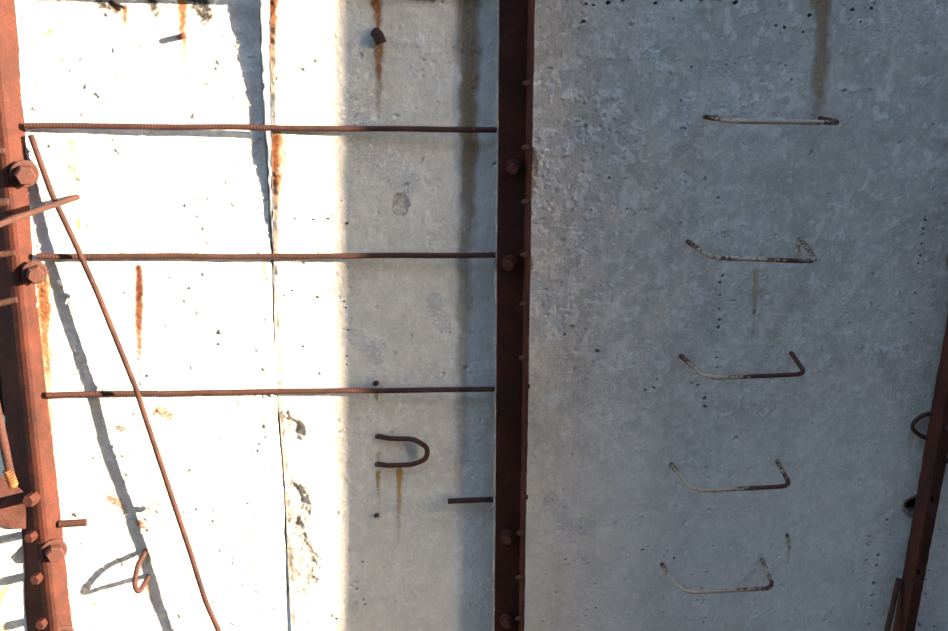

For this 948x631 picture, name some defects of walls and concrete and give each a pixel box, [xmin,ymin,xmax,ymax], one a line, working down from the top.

corrosion [177,0,187,56]
corrosion [371,0,382,29]
corrosion [375,44,383,87]
corrosion [272,133,283,205]
corrosion [37,274,52,389]
corrosion [135,265,144,355]
spalling [0,67,497,631]